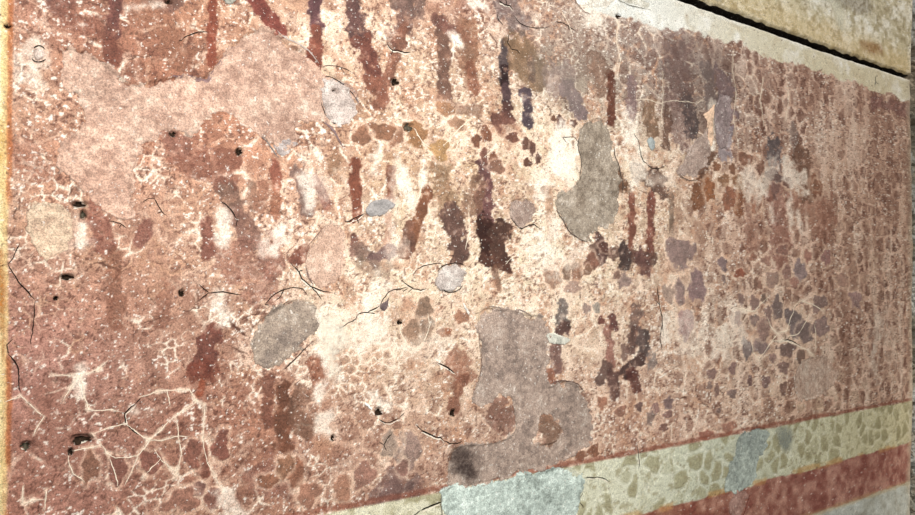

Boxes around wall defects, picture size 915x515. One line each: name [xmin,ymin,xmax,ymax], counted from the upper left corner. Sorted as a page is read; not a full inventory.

crack [497,0,574,53]
flaking render [25,25,359,261]
flaking render [555,120,624,242]
crack [639,78,704,129]
crack [1,243,45,434]
flaking render [250,301,319,369]
crack [53,362,221,490]
flaking render [439,303,593,515]
flaking render [724,428,770,515]